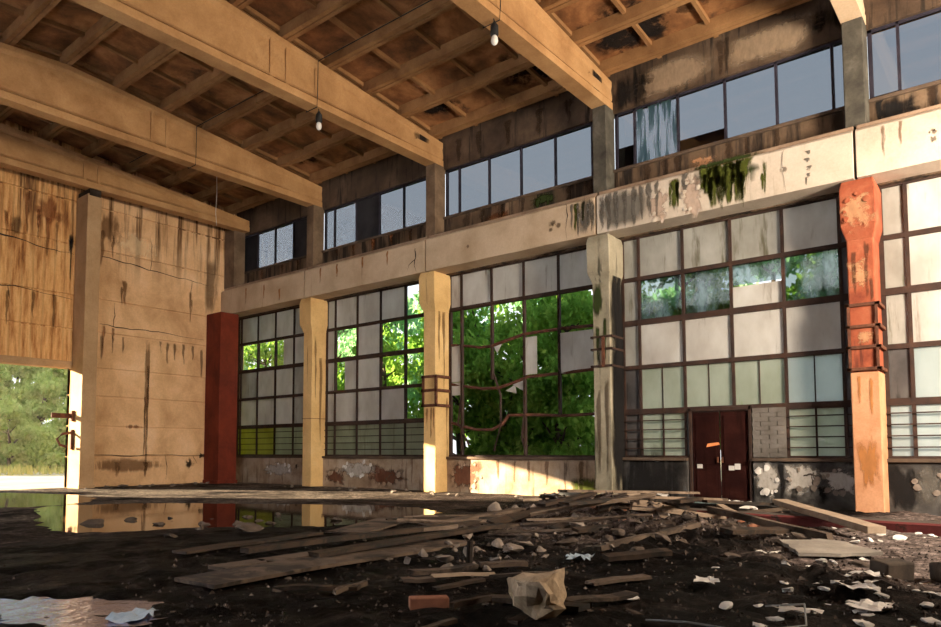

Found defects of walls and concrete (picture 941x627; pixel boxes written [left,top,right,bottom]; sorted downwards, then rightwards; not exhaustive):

damp [700,157,753,208]
damp [570,173,688,234]
peeling [841,192,874,225]
damp [100,218,118,263]
peeling [849,258,869,285]
spalling [326,459,404,487]
peeling [754,462,854,497]
peeling [911,467,941,503]